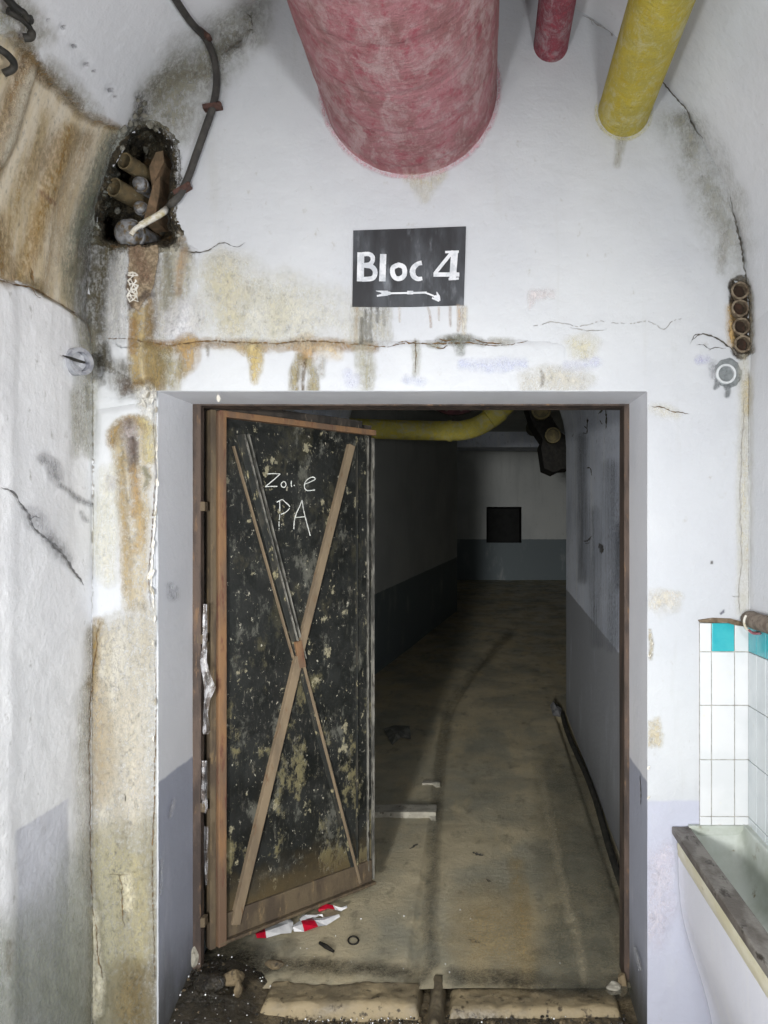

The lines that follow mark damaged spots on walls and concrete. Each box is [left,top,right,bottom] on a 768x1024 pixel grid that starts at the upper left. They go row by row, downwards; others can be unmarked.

leakage [118,10,257,134]
crack [663,82,703,139]
leakage [72,145,138,452]
spalling [83,98,189,311]
rust [129,299,376,393]
crack [0,269,739,373]
crack [730,197,747,282]
crack [1,374,157,980]